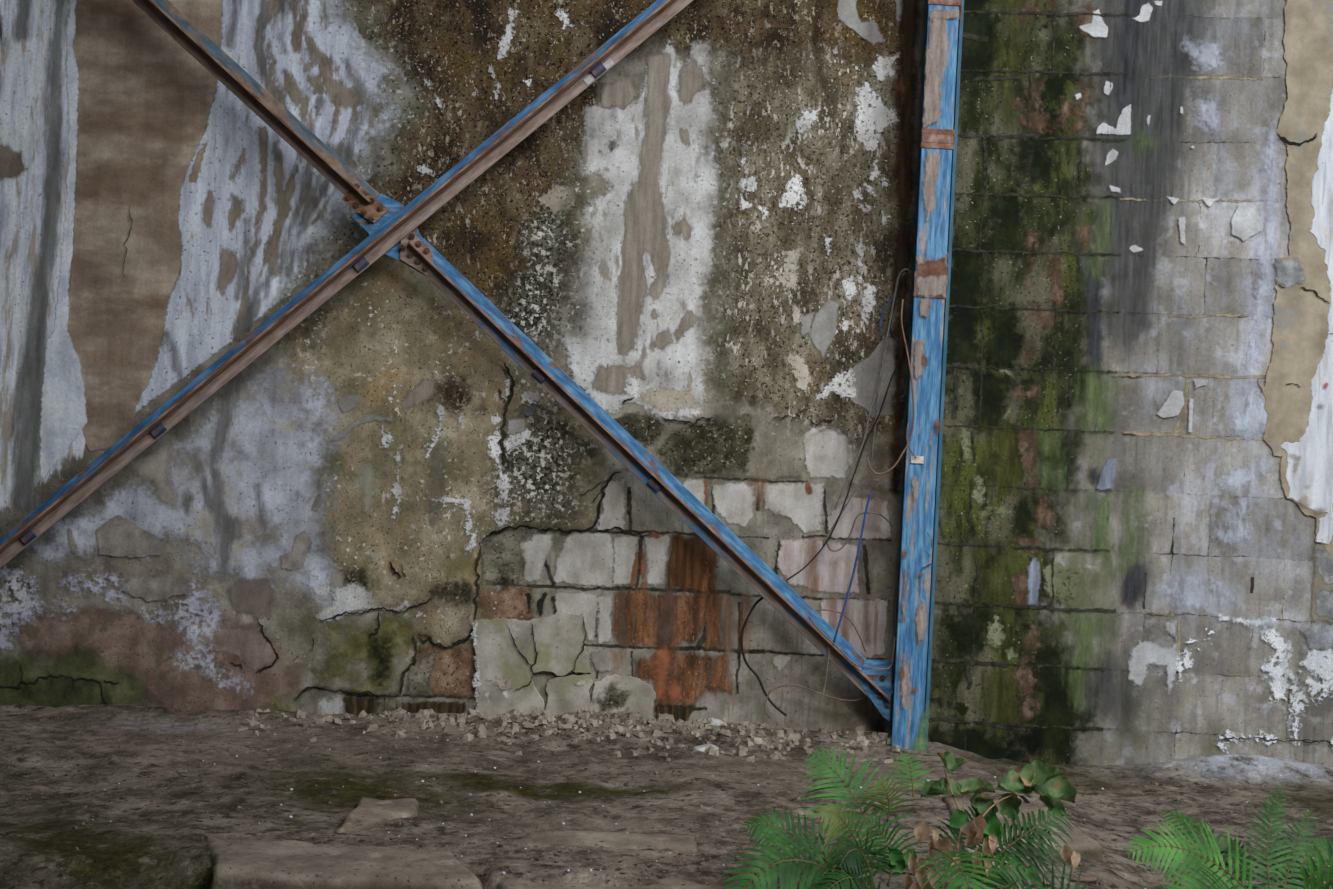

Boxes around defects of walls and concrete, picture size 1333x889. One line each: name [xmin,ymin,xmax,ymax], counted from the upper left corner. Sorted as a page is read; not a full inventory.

water stain [0,562,301,712]
peeling [0,0,357,510]
peeling [168,0,443,180]
crack [230,472,649,700]
water stain [279,254,606,715]
water stain [256,0,656,207]
water stain [417,0,917,477]
corrosion [613,531,749,707]
corrosion [890,0,959,509]
peeling [1078,0,1108,37]
water stain [1072,0,1223,430]
flaking render [1258,0,1333,640]